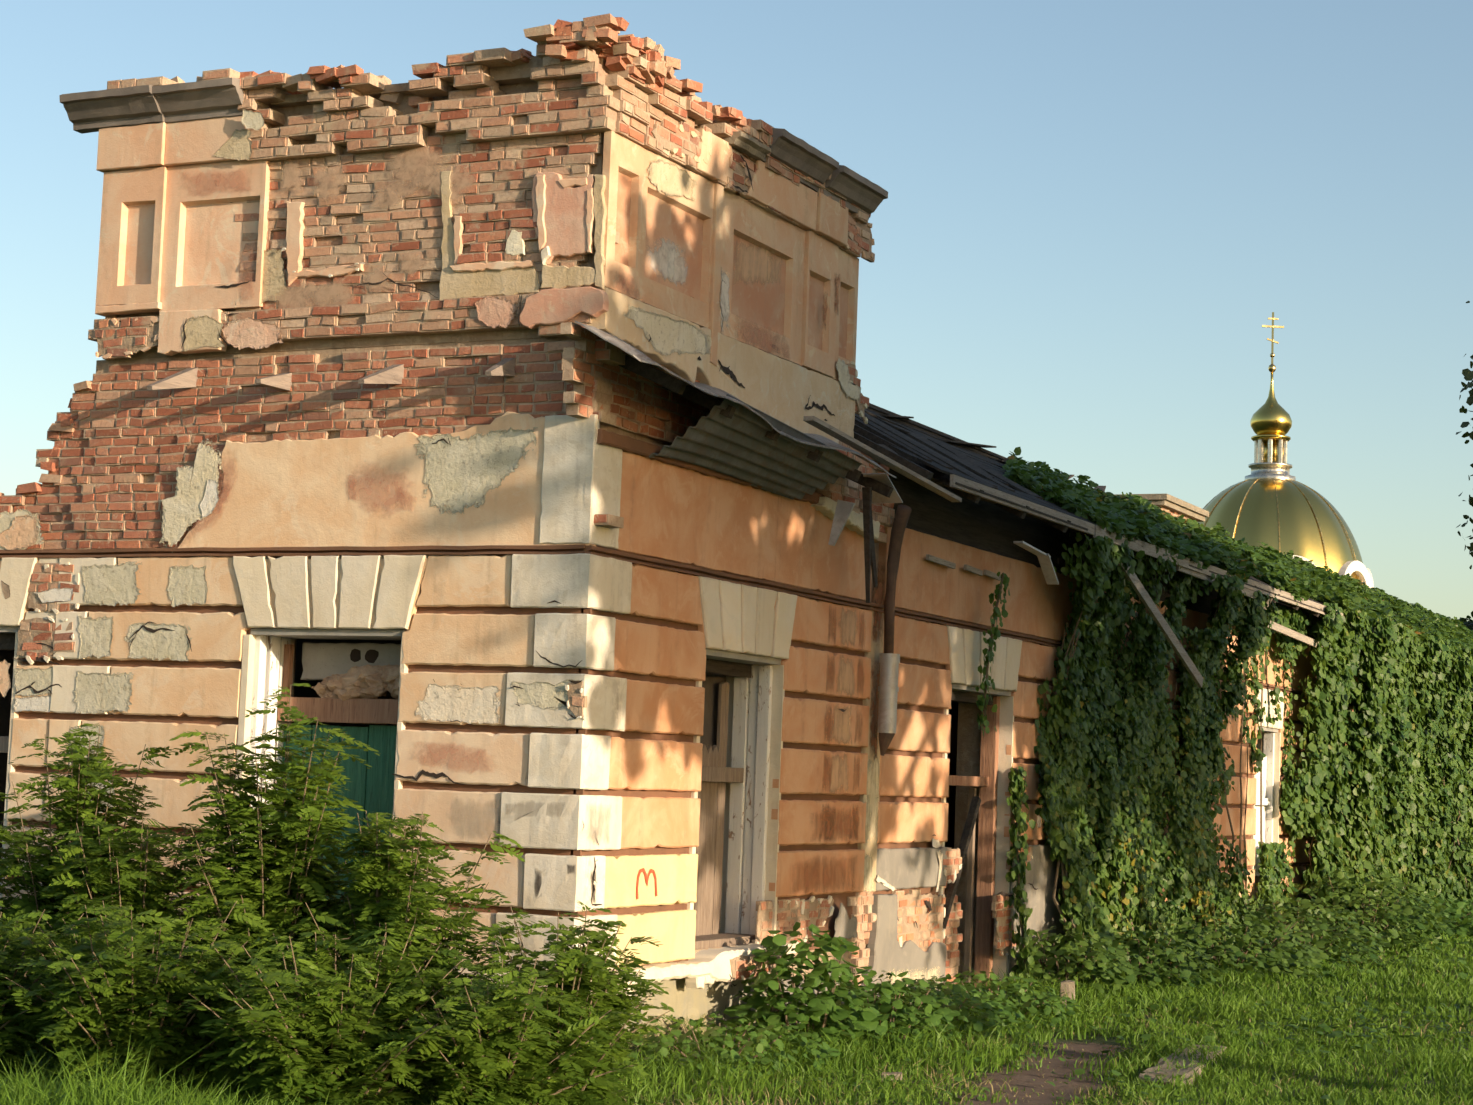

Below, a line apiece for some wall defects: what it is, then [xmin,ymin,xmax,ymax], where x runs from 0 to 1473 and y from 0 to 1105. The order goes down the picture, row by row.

spalling [647,117,712,202]
peeling [623,305,712,357]
crack [698,270,745,388]
spalling [0,41,625,765]
crack [805,395,835,421]
crack [128,621,192,651]
crack [392,770,464,785]
spalling [876,838,962,951]
spalling [730,895,834,981]